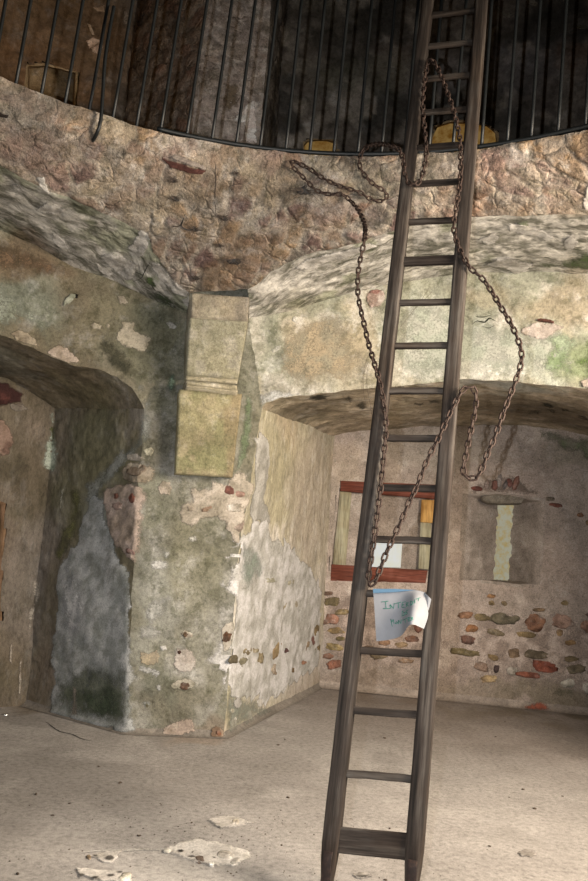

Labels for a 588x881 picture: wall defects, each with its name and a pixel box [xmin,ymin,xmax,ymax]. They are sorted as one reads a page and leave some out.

spalling [0,419,13,456]
water stain [44,419,58,471]
peeling [50,447,196,732]
peeling [180,431,350,721]
spalling [361,597,423,667]
spalling [76,838,250,881]